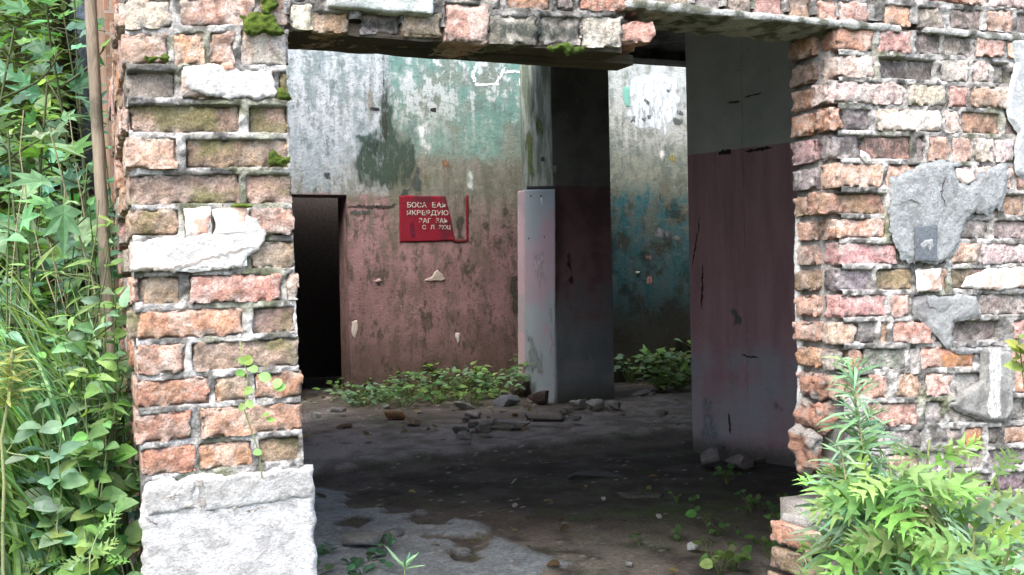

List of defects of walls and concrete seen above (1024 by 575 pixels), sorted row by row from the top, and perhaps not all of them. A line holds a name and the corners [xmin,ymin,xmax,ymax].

leakage [355,79,415,189]
peeling [418,108,436,151]
spalling [956,168,975,185]
flaking render [184,207,248,236]
flaking render [920,239,934,251]
flaking render [168,258,247,273]
crack [692,219,703,309]